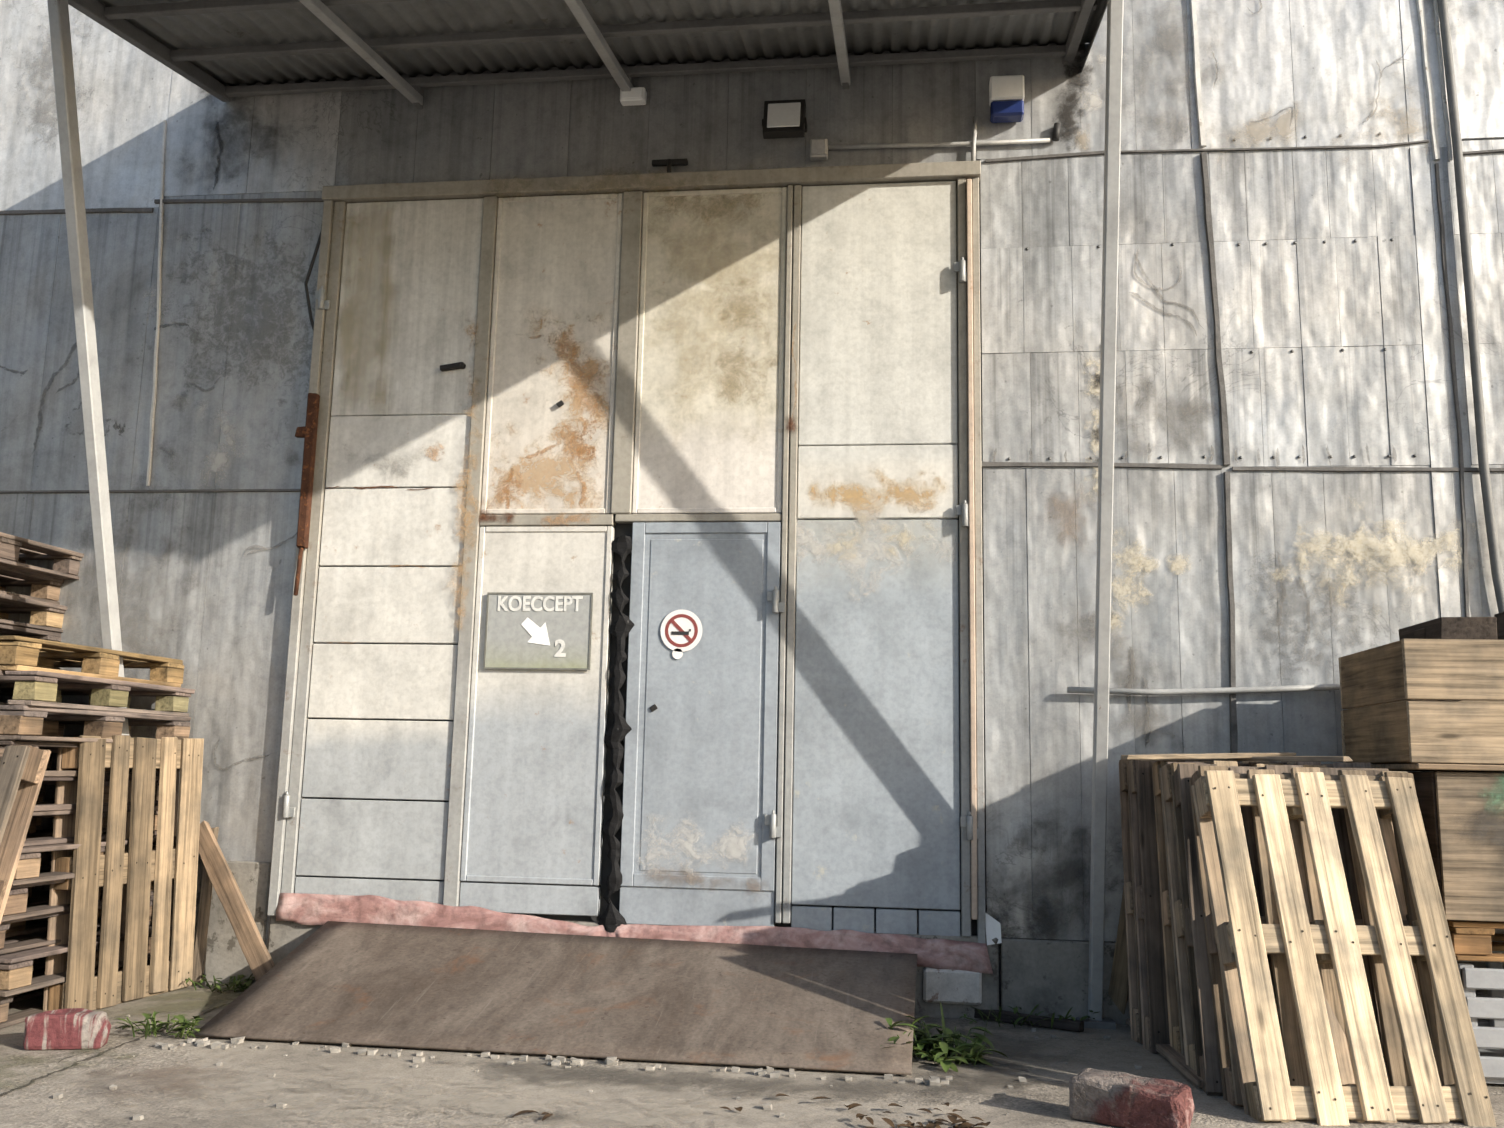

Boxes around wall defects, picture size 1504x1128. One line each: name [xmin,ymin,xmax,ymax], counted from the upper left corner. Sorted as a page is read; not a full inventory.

rust [456,325,608,538]
rust [811,479,932,515]